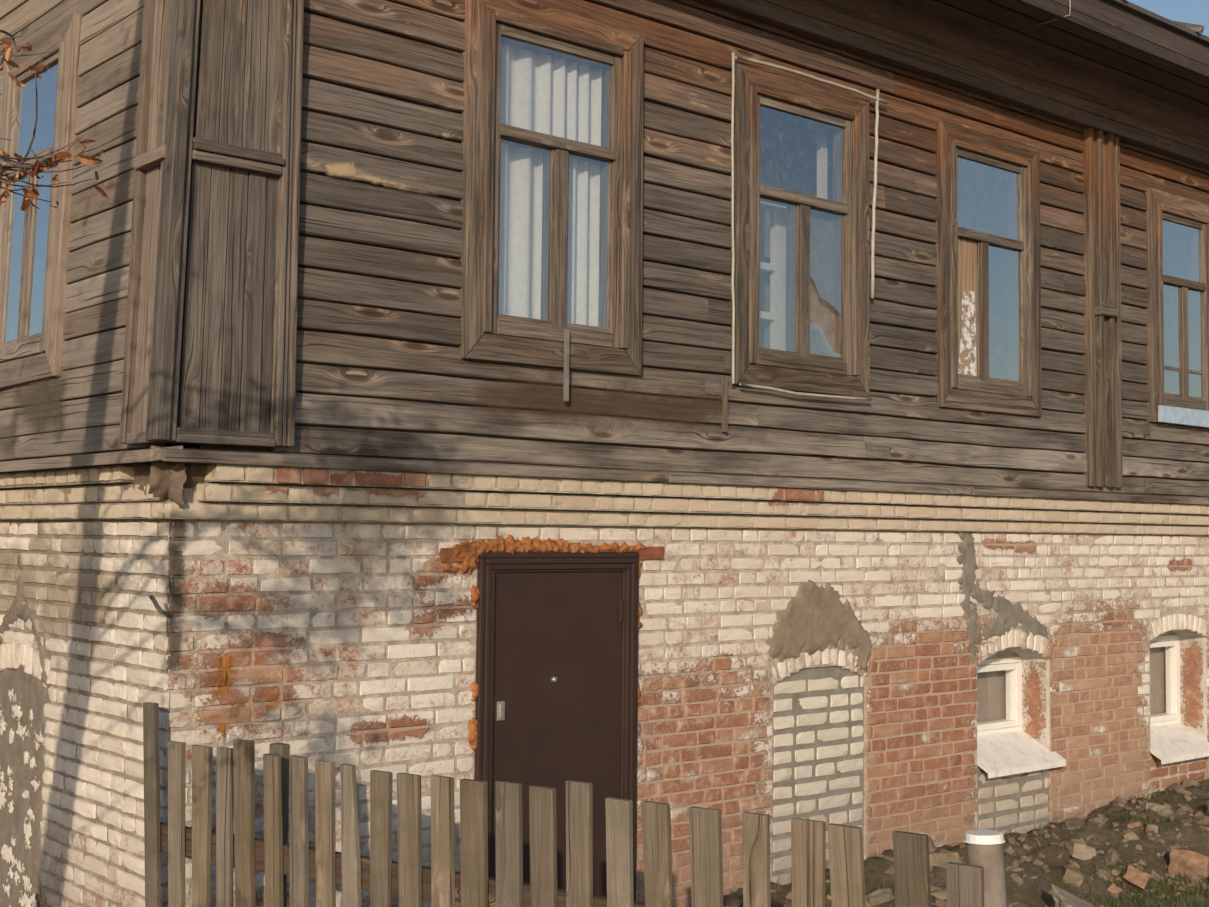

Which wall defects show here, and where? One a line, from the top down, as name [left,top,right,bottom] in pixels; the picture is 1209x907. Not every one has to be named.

crack [0,549,51,688]
peeling [0,689,52,907]
peeling [180,581,313,746]
peeling [347,714,434,744]
peeling [405,536,476,639]
peeling [636,631,773,907]
peeling [852,610,997,858]
crack [954,531,1047,664]
peeling [1022,583,1153,824]